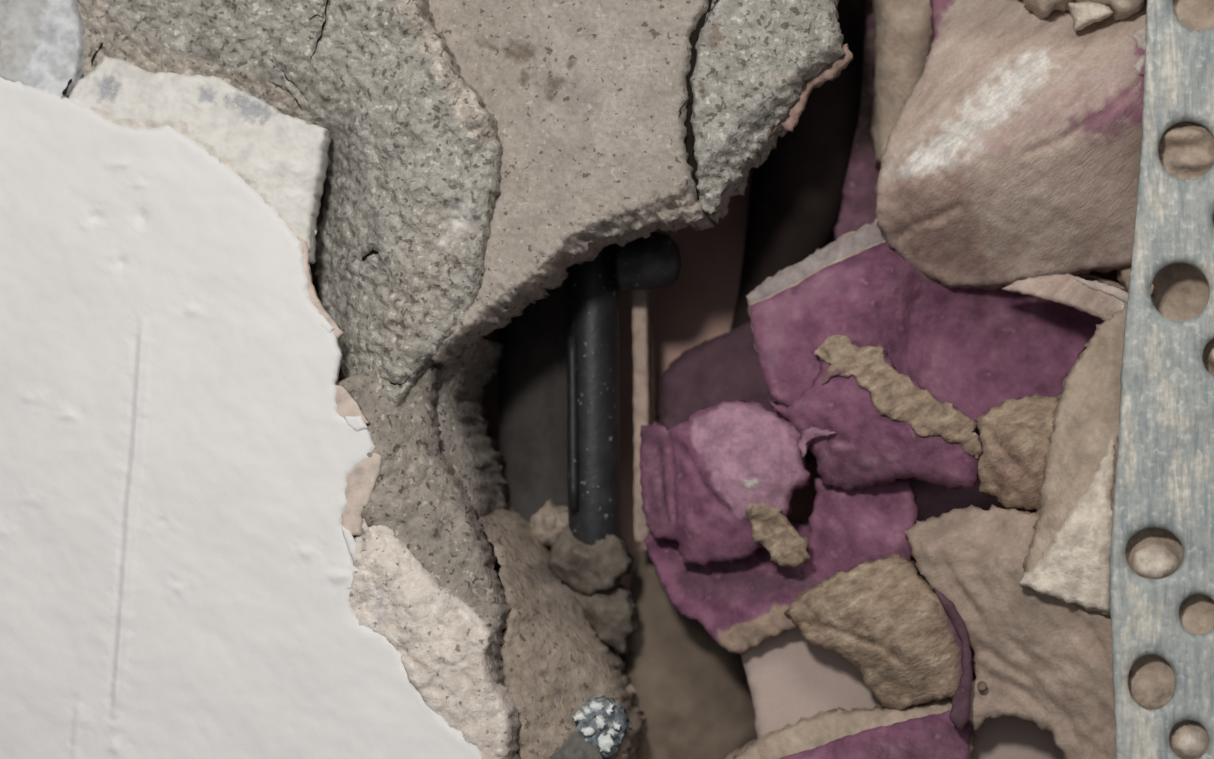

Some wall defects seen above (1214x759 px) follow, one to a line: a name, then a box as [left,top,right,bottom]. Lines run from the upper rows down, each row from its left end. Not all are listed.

crack [267,0,329,111]
crack [678,0,717,193]
peeling [1068,1,1113,32]
flaking render [0,0,715,759]
spalling [1018,435,1116,613]